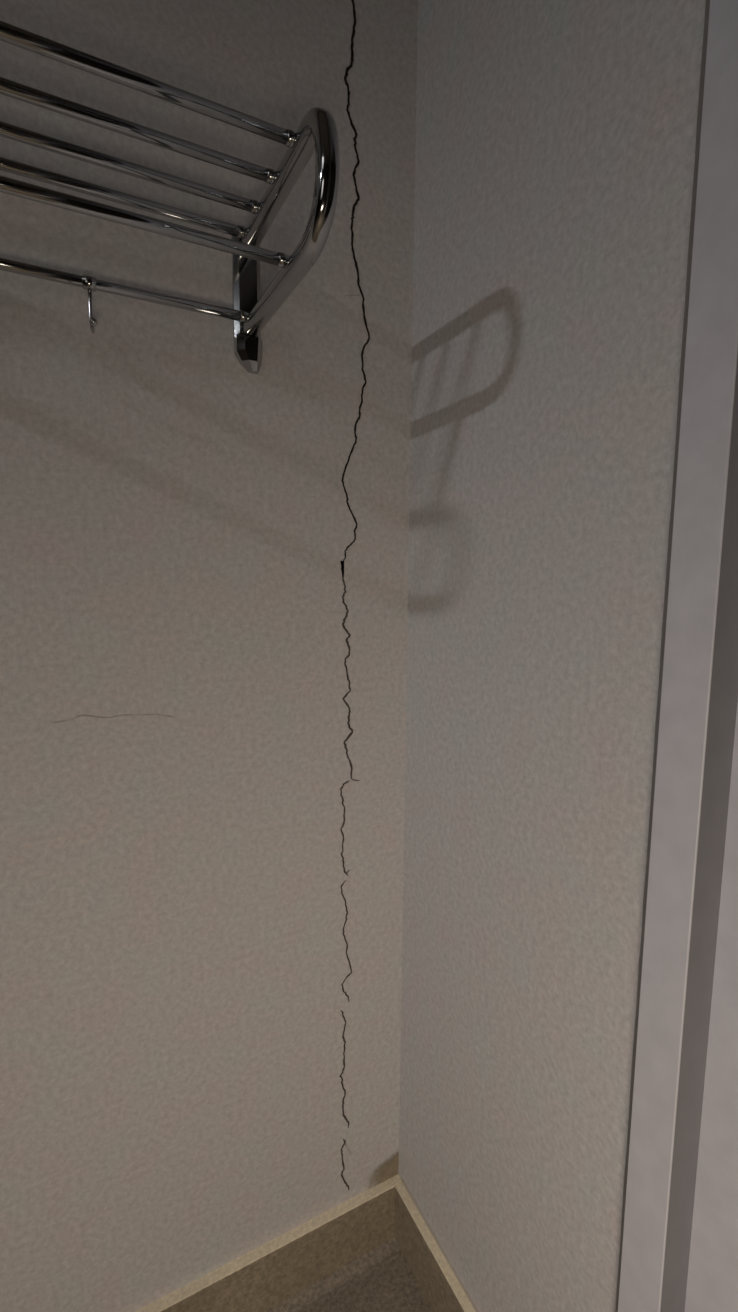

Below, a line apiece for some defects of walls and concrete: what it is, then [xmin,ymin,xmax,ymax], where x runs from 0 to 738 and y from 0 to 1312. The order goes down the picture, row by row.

crack [339,0,370,1191]